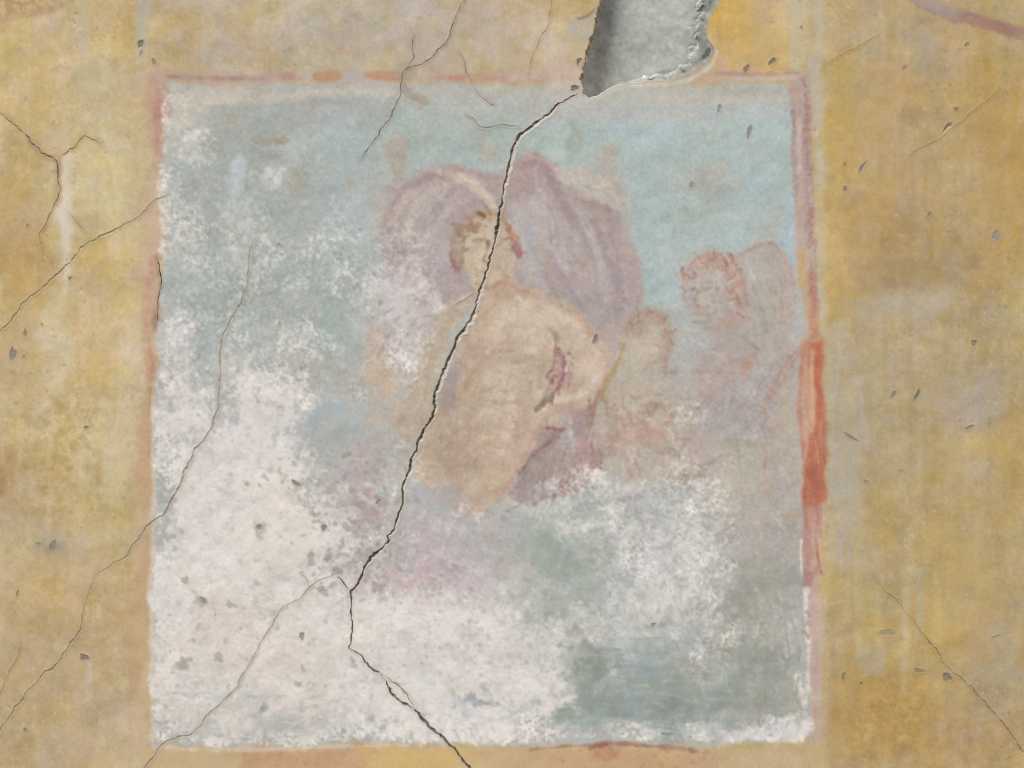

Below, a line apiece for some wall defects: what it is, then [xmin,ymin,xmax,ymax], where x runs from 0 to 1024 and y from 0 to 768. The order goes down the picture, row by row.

spalling [544,0,721,120]
crack [0,111,171,334]
crack [0,240,255,735]
crack [141,0,580,768]
crack [870,572,1024,756]